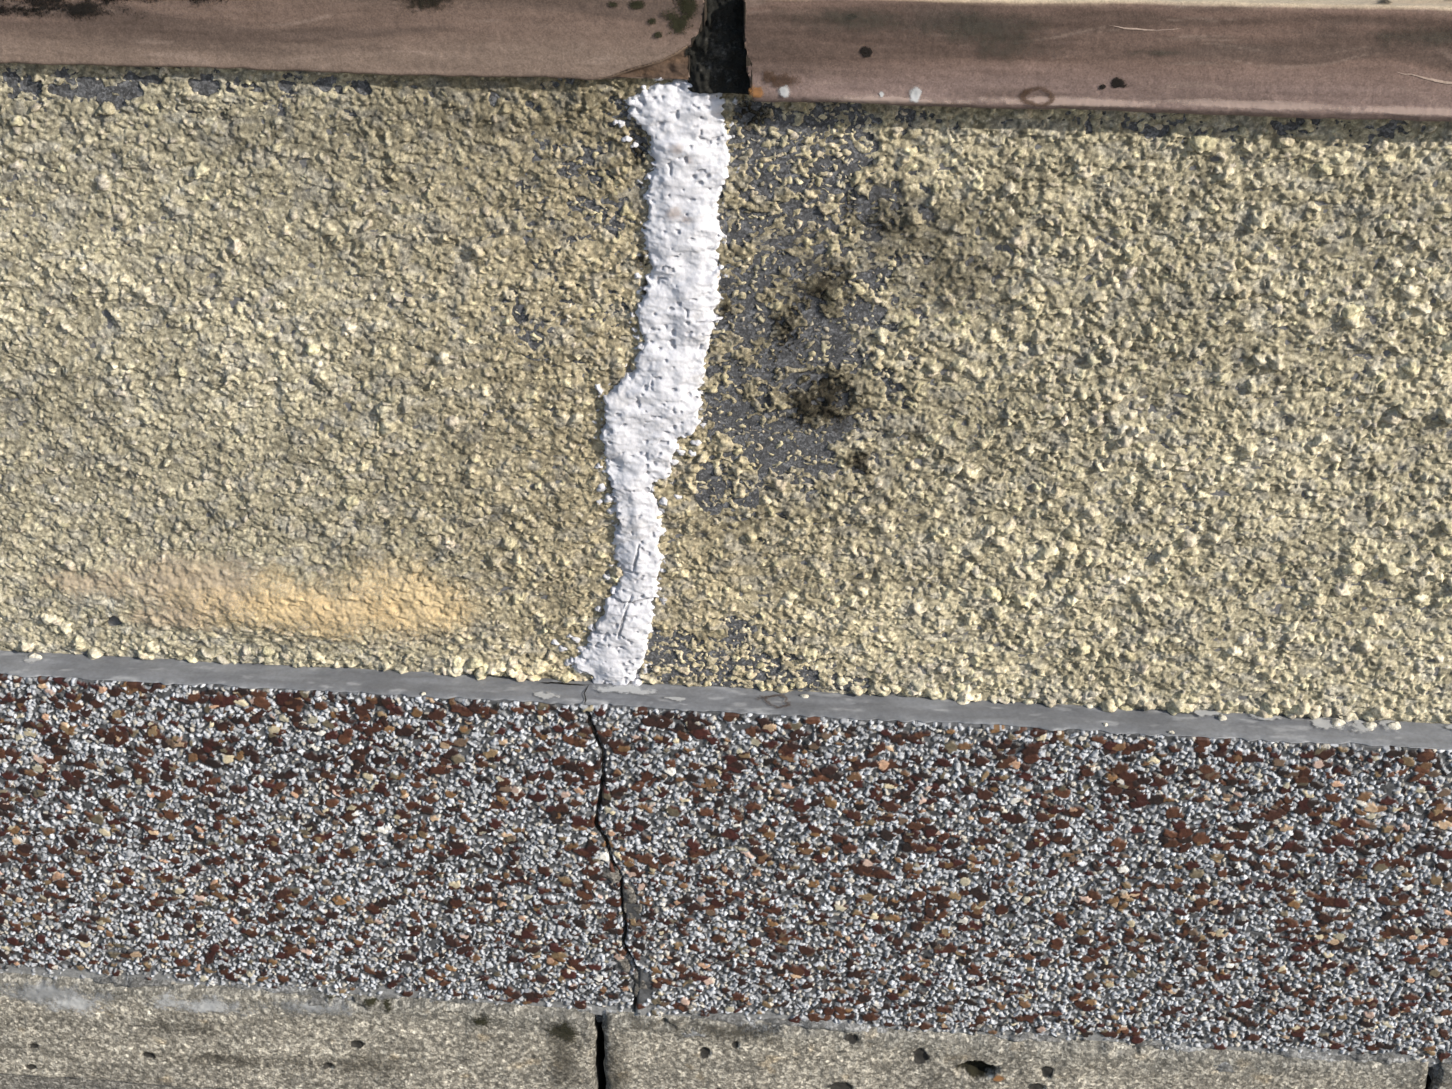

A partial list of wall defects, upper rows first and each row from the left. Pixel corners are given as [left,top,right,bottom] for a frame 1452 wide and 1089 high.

leakage [0,0,158,21]
leakage [630,128,644,168]
leakage [719,288,732,318]
leakage [765,264,851,359]
leakage [787,366,869,429]
leakage [846,448,872,475]
crack [540,682,638,1010]